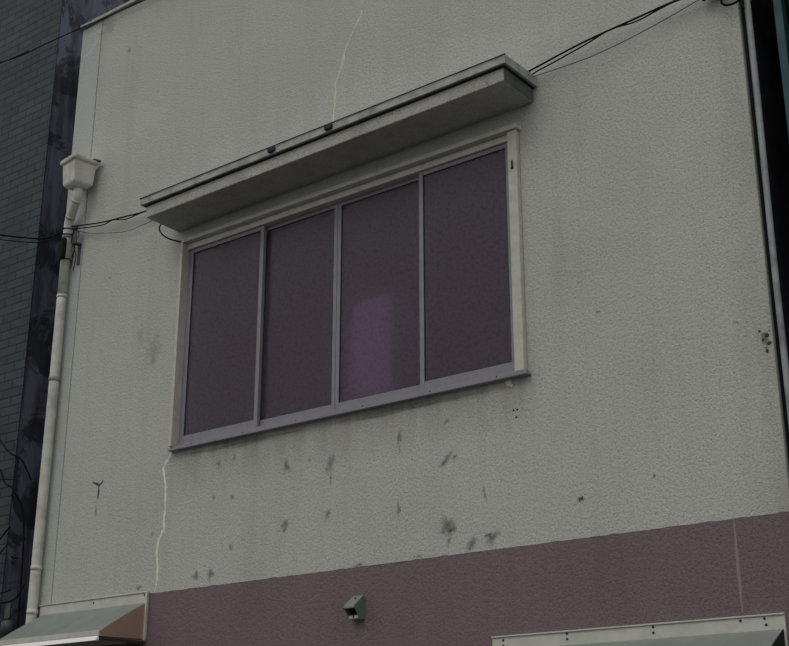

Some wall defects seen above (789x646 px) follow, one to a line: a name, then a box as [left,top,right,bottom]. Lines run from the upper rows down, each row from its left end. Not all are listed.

crack [332,0,362,122]
crack [154,452,172,592]